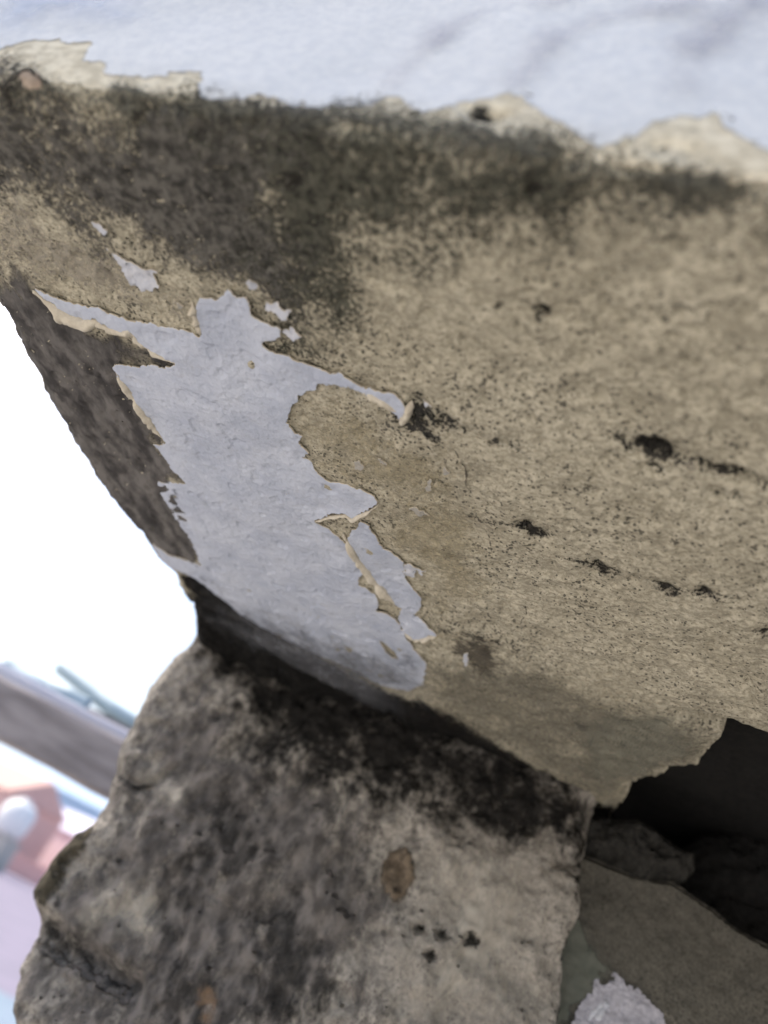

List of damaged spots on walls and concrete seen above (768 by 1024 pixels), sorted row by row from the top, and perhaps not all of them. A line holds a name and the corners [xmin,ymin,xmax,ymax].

peeling [91,221,160,292]
leakage [0,56,768,563]
peeling [32,279,439,691]
leakage [91,791,265,933]
leakage [180,573,702,879]